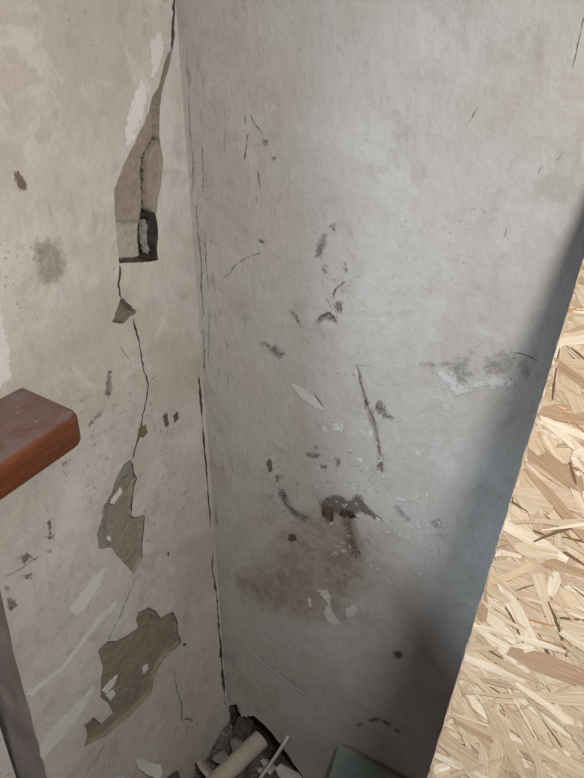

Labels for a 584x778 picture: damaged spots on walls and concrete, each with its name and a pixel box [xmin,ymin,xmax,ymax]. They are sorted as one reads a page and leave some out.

crack [168,0,176,52]
spalling [114,52,172,264]
crack [110,265,121,298]
spalling [112,298,137,324]
crack [188,99,262,525]
crack [120,318,156,475]
spalling [97,460,145,574]
leakage [320,483,378,560]
spalling [84,607,181,746]
crack [211,556,225,704]
spalling [229,704,303,778]